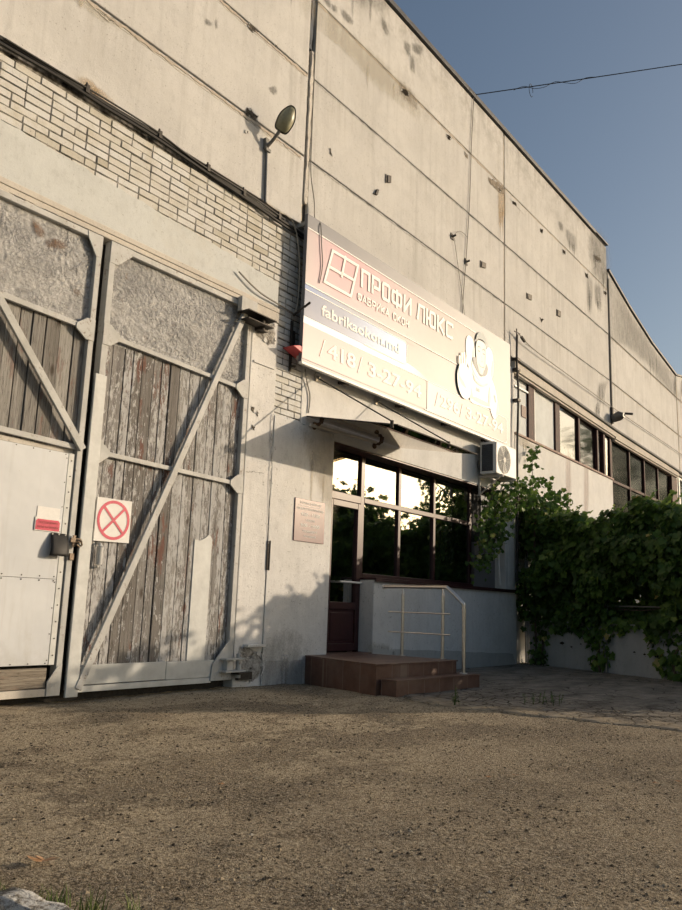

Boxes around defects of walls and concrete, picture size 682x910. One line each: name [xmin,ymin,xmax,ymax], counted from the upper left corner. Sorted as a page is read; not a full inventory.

flaking render [238,646,264,683]